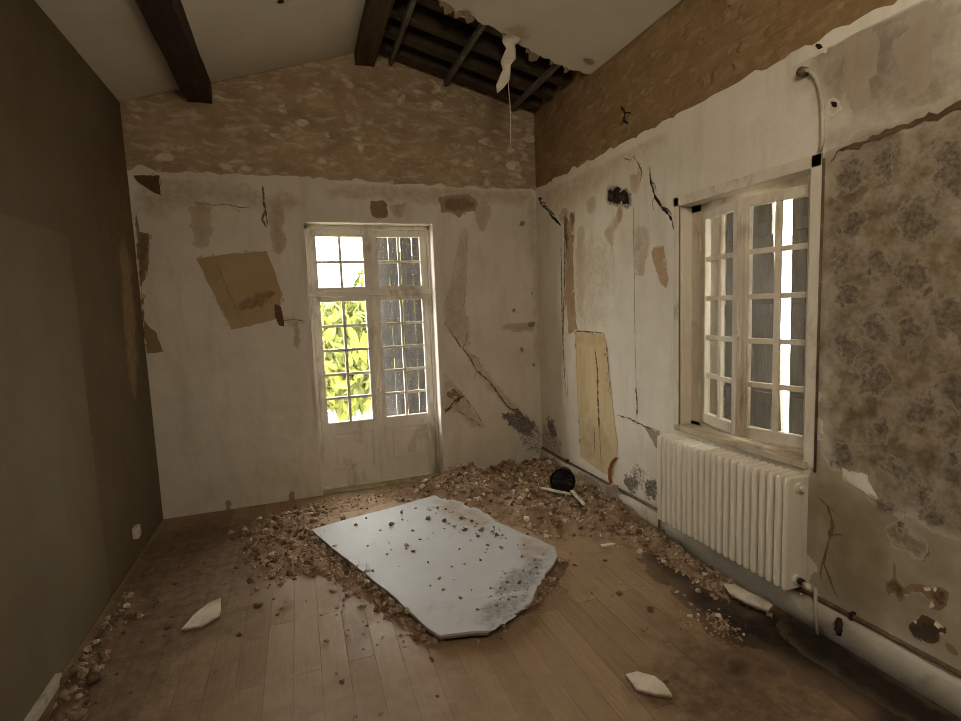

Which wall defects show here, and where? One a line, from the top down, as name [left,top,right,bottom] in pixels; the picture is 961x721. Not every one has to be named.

peeling [133,173,162,197]
crack [625,155,674,234]
peeling [132,210,164,353]
peeling [196,250,284,330]
peeling [438,194,478,350]
peeling [632,223,669,288]
damp [787,0,961,671]
crack [446,325,542,440]
damp [502,410,562,457]
damp [579,413,657,501]
damp [636,552,961,721]
peeling [886,563,958,656]